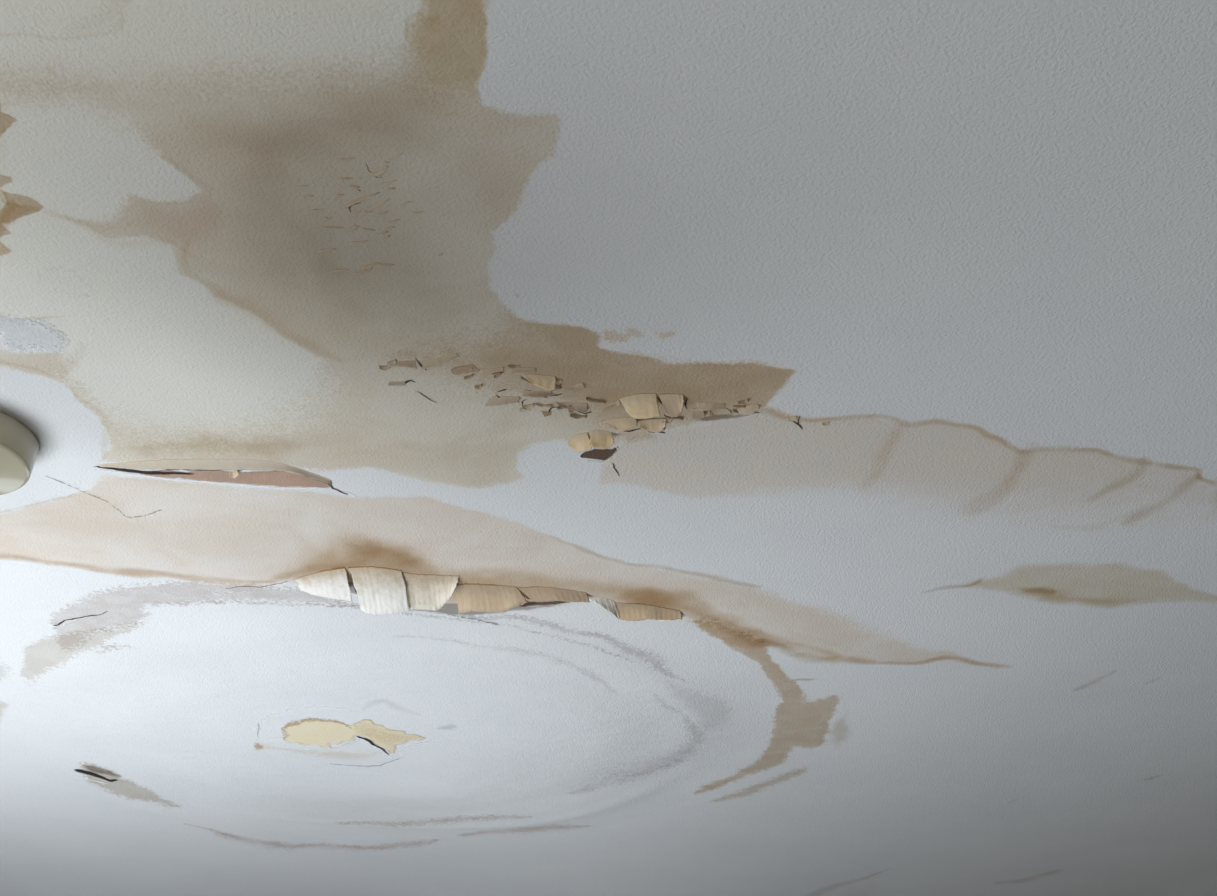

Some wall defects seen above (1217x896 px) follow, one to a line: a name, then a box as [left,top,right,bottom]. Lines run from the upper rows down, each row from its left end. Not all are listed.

peeling [379,353,760,475]
crack [46,459,359,518]
peeling [281,708,429,767]